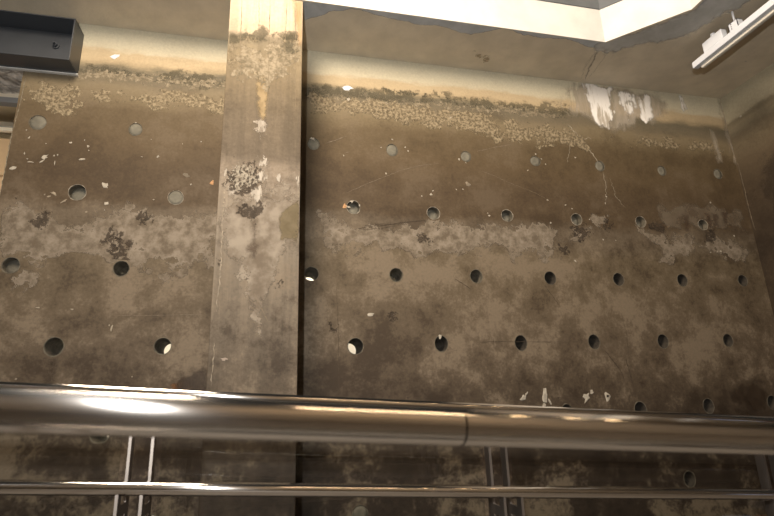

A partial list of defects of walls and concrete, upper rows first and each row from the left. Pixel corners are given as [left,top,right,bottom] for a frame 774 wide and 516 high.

damp [160,70,224,89]
damp [308,83,665,129]
damp [28,206,51,230]
damp [135,210,154,226]
damp [100,225,137,260]
peeling [0,155,299,336]